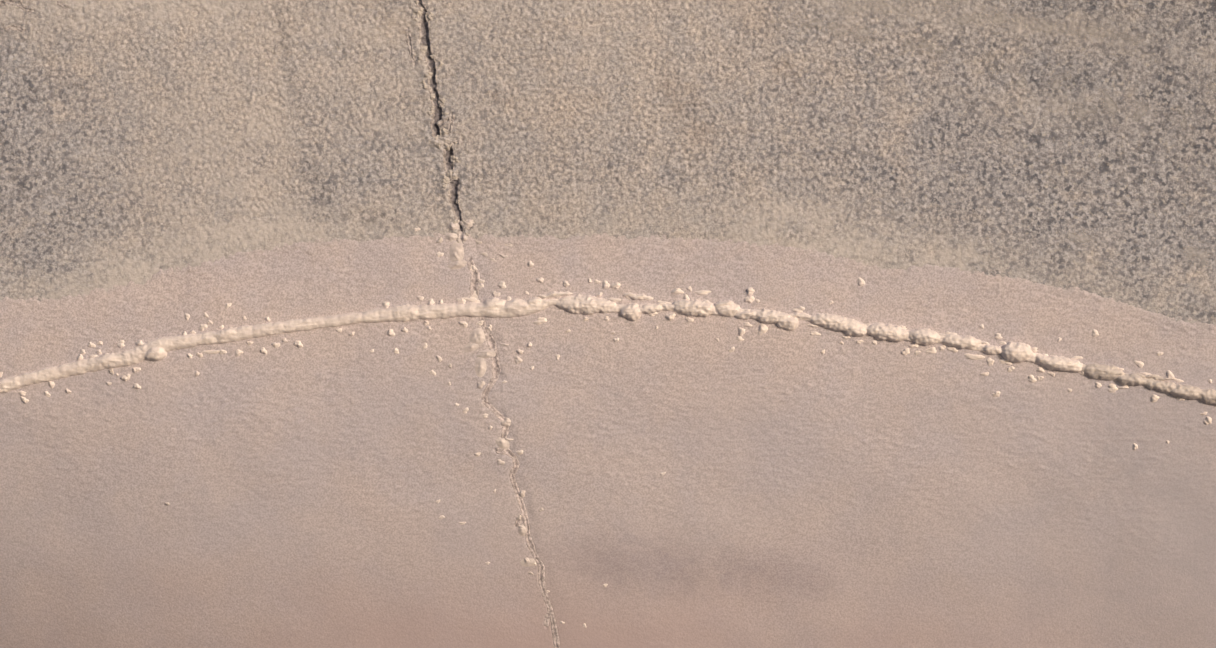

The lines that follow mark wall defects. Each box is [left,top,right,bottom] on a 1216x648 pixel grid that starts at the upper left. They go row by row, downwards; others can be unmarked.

crack [0,0,70,32]
crack [405,0,586,648]